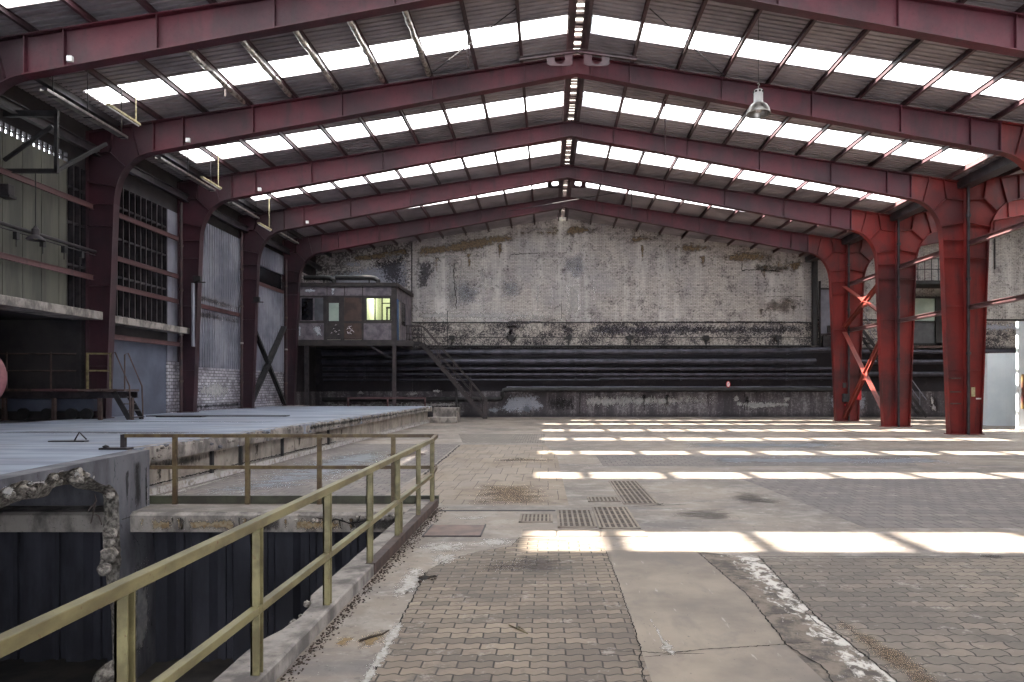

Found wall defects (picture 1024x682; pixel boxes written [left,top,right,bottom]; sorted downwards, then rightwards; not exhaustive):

spalling [0,602,114,682]
spalling [0,467,121,634]
spalling [152,532,250,662]
spalling [263,514,395,639]